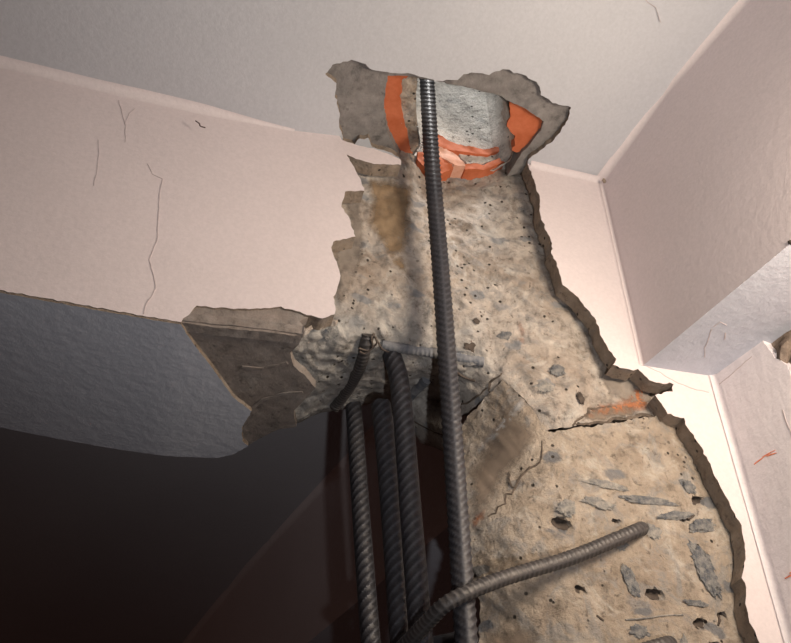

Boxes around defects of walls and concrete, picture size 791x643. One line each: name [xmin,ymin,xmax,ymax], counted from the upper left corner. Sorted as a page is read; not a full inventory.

crack [143,165,163,314]
water stain [372,181,409,268]
spalling [182,60,744,643]
crack [488,441,543,517]